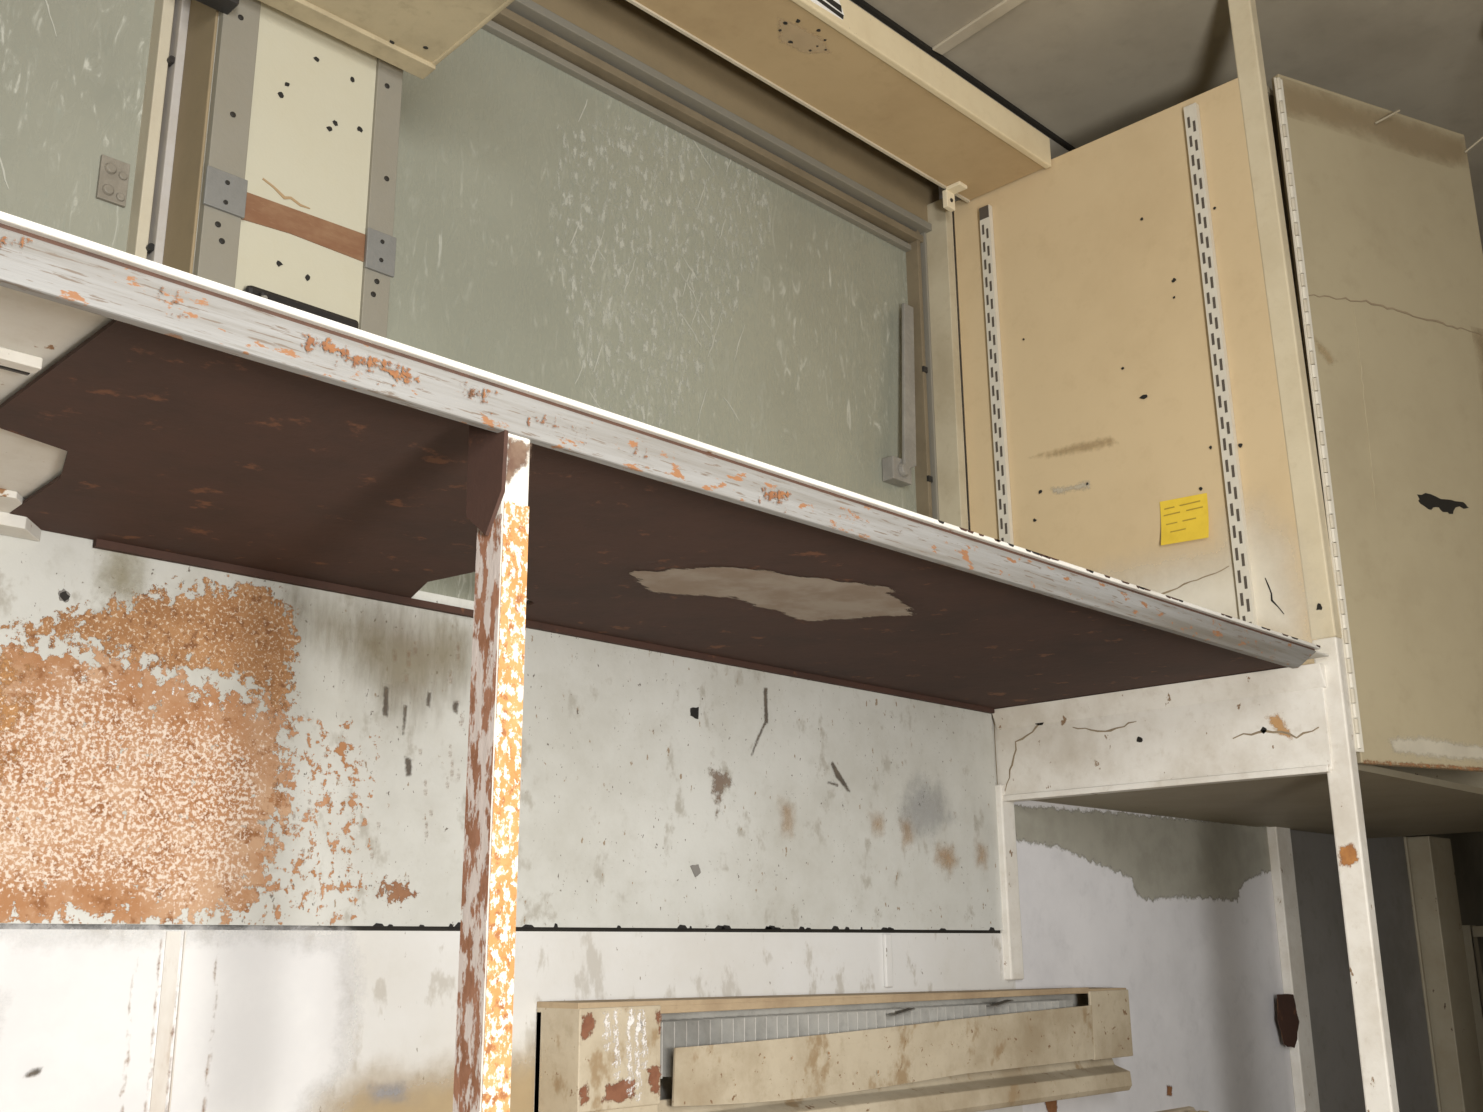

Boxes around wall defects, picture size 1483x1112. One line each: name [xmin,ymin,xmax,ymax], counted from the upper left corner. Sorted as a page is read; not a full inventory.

peeling [1014,805,1271,902]